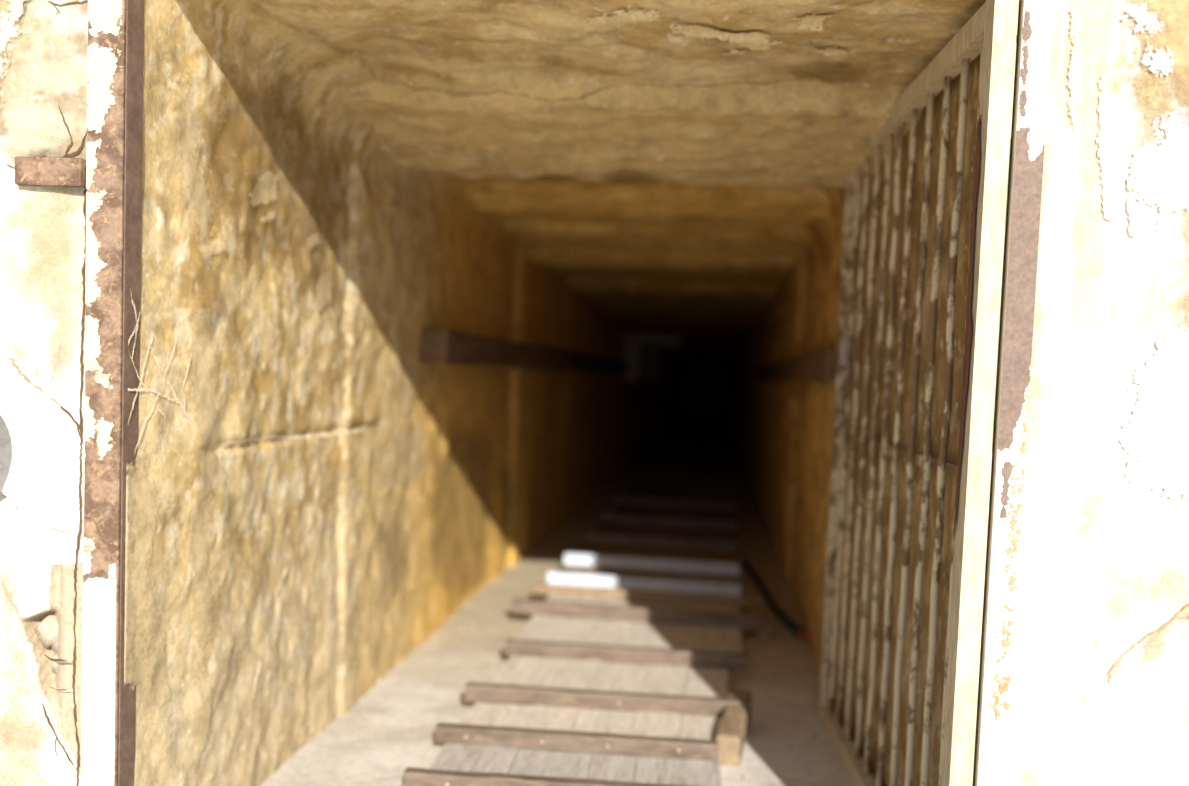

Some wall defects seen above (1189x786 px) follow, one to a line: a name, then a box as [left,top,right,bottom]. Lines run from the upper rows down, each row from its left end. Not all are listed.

flaking render [0,0,26,77]
damp [1067,8,1082,130]
flaking render [1122,4,1175,77]
damp [1124,0,1189,145]
damp [1096,75,1139,237]
flaking render [1126,107,1189,232]
rust [989,10,1045,721]
crack [1108,605,1189,684]